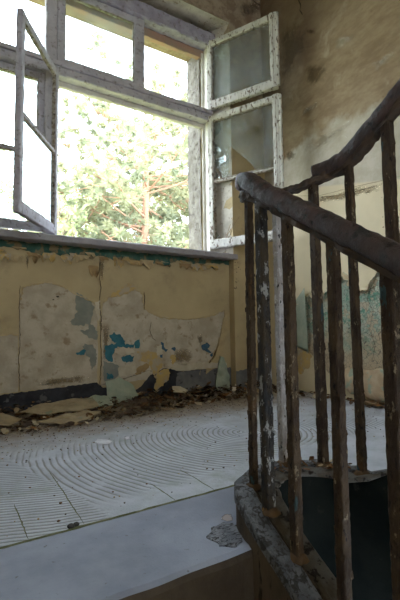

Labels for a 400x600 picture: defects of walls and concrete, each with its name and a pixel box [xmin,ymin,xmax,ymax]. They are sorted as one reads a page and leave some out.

peeling [12,246,109,277]
peeling [116,255,171,269]
crack [97,264,105,385]
peeling [0,282,228,394]
peeling [296,289,314,356]
peeling [341,272,353,369]
peeling [359,272,383,370]